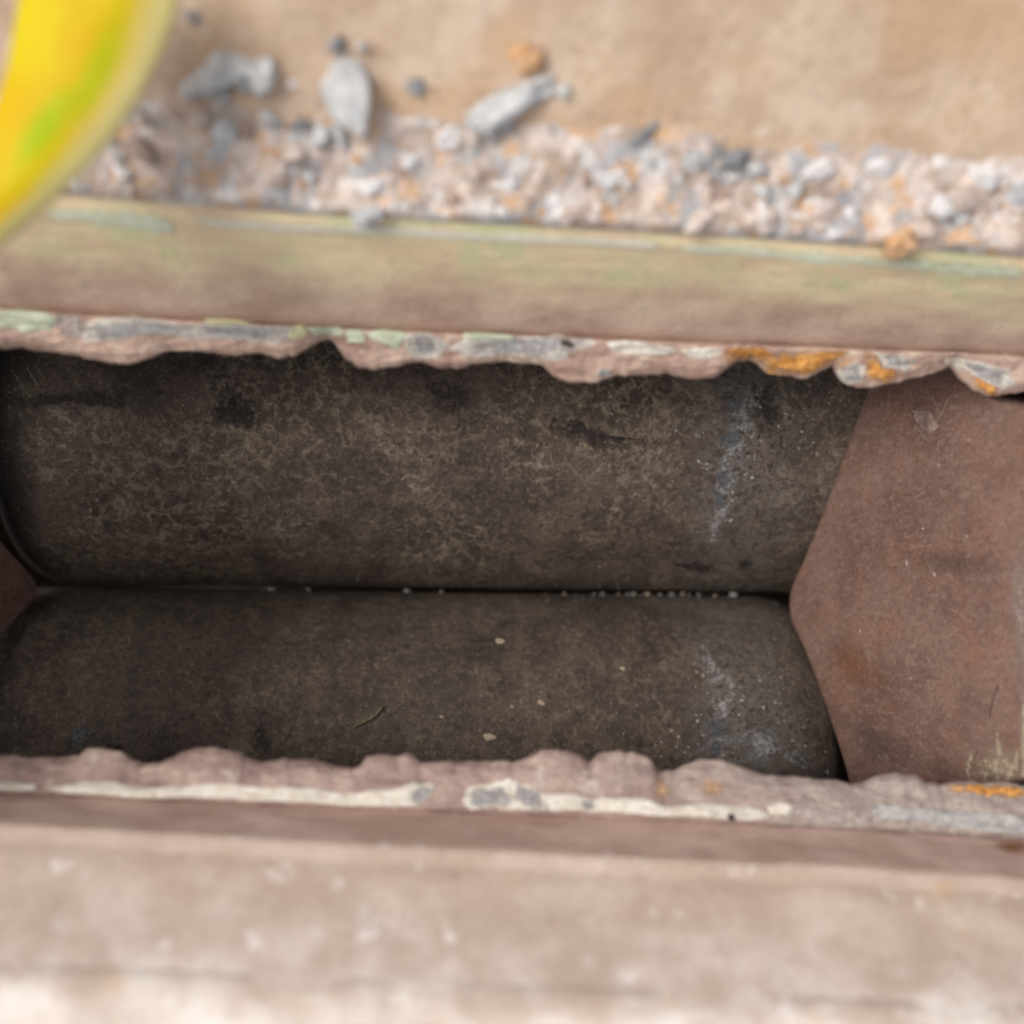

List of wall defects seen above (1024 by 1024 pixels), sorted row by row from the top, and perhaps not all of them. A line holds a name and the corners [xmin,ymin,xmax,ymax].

peeling [0,309,724,362]
corrosion [722,347,852,376]
peeling [836,361,867,385]
corrosion [865,354,898,383]
peeling [873,351,917,371]
peeling [945,357,1016,390]
corrosion [974,378,996,396]
peeling [0,781,435,807]
peeling [462,778,1024,834]